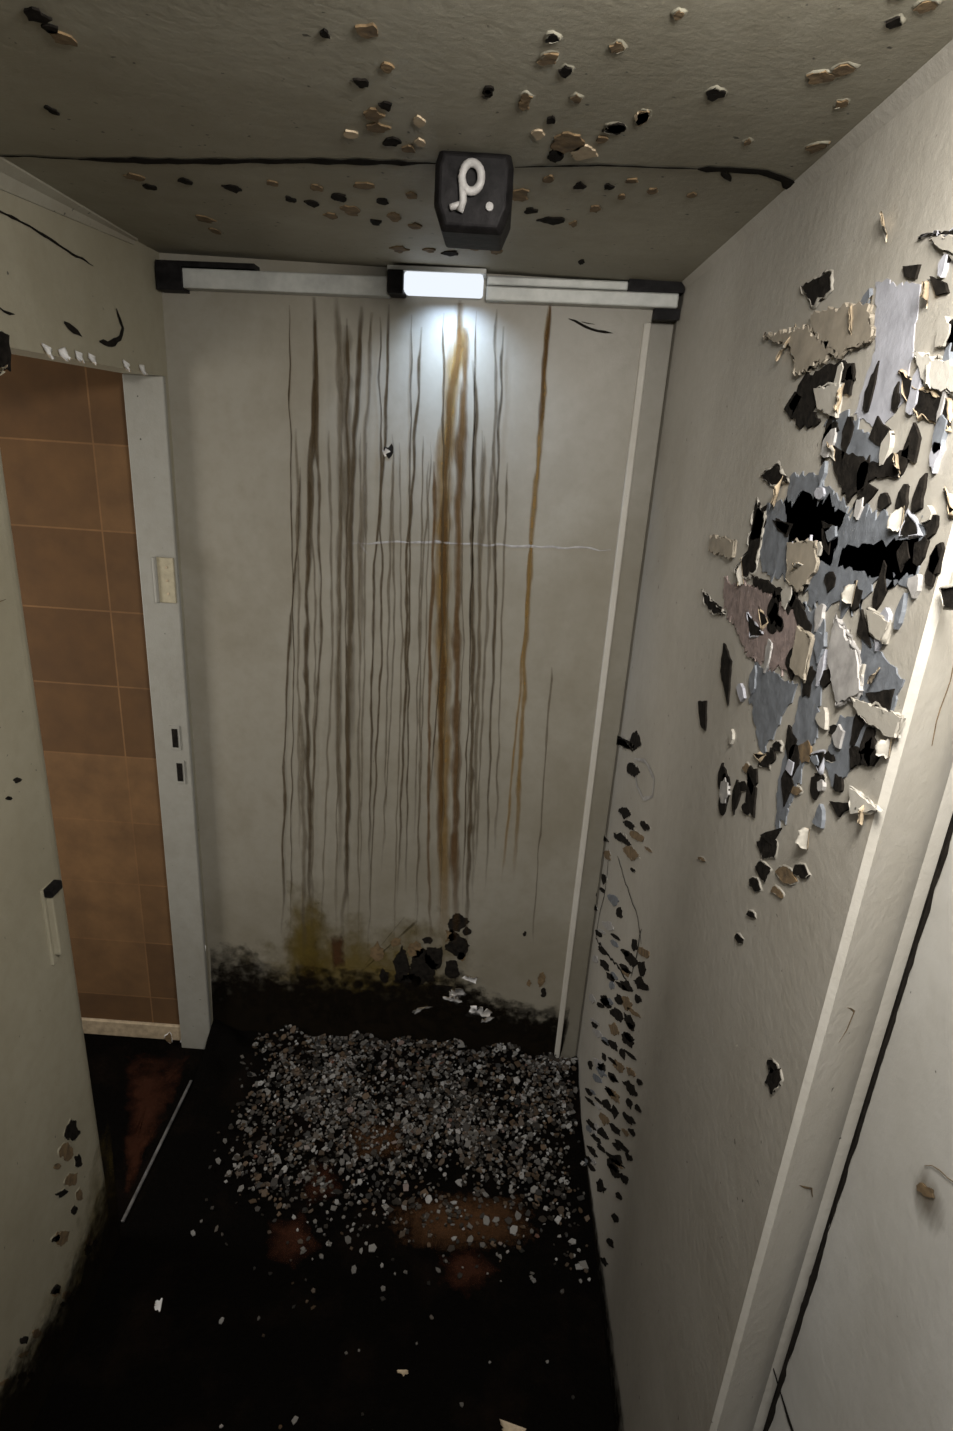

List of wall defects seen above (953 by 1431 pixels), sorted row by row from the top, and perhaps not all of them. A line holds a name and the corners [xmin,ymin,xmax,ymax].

water stain [211,316,569,1058]
corrosion [427,313,485,892]
corrosion [505,306,551,840]
spalling [616,730,642,779]
peeling [698,701,707,731]
peeling [701,228,953,920]
crack [932,667,953,745]
peeling [584,806,653,1280]
crack [766,826,953,1431]